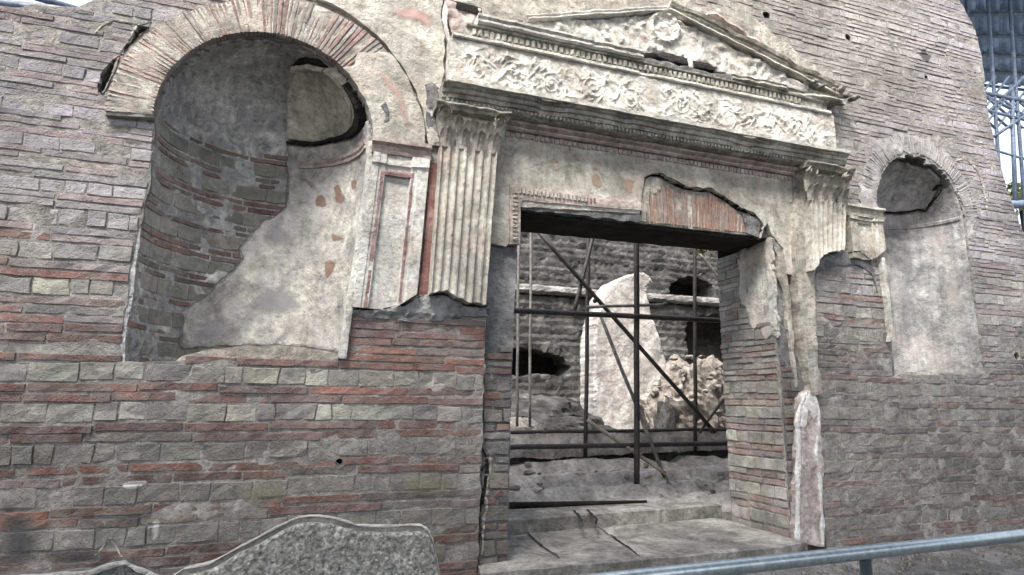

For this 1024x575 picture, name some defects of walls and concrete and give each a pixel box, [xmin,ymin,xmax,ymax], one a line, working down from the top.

flaking render [180,137,290,345]
spalling [640,173,765,245]
spalling [813,250,878,293]
crack [884,156,989,222]
crack [478,448,492,555]
crack [526,531,560,558]
crack [573,509,640,556]